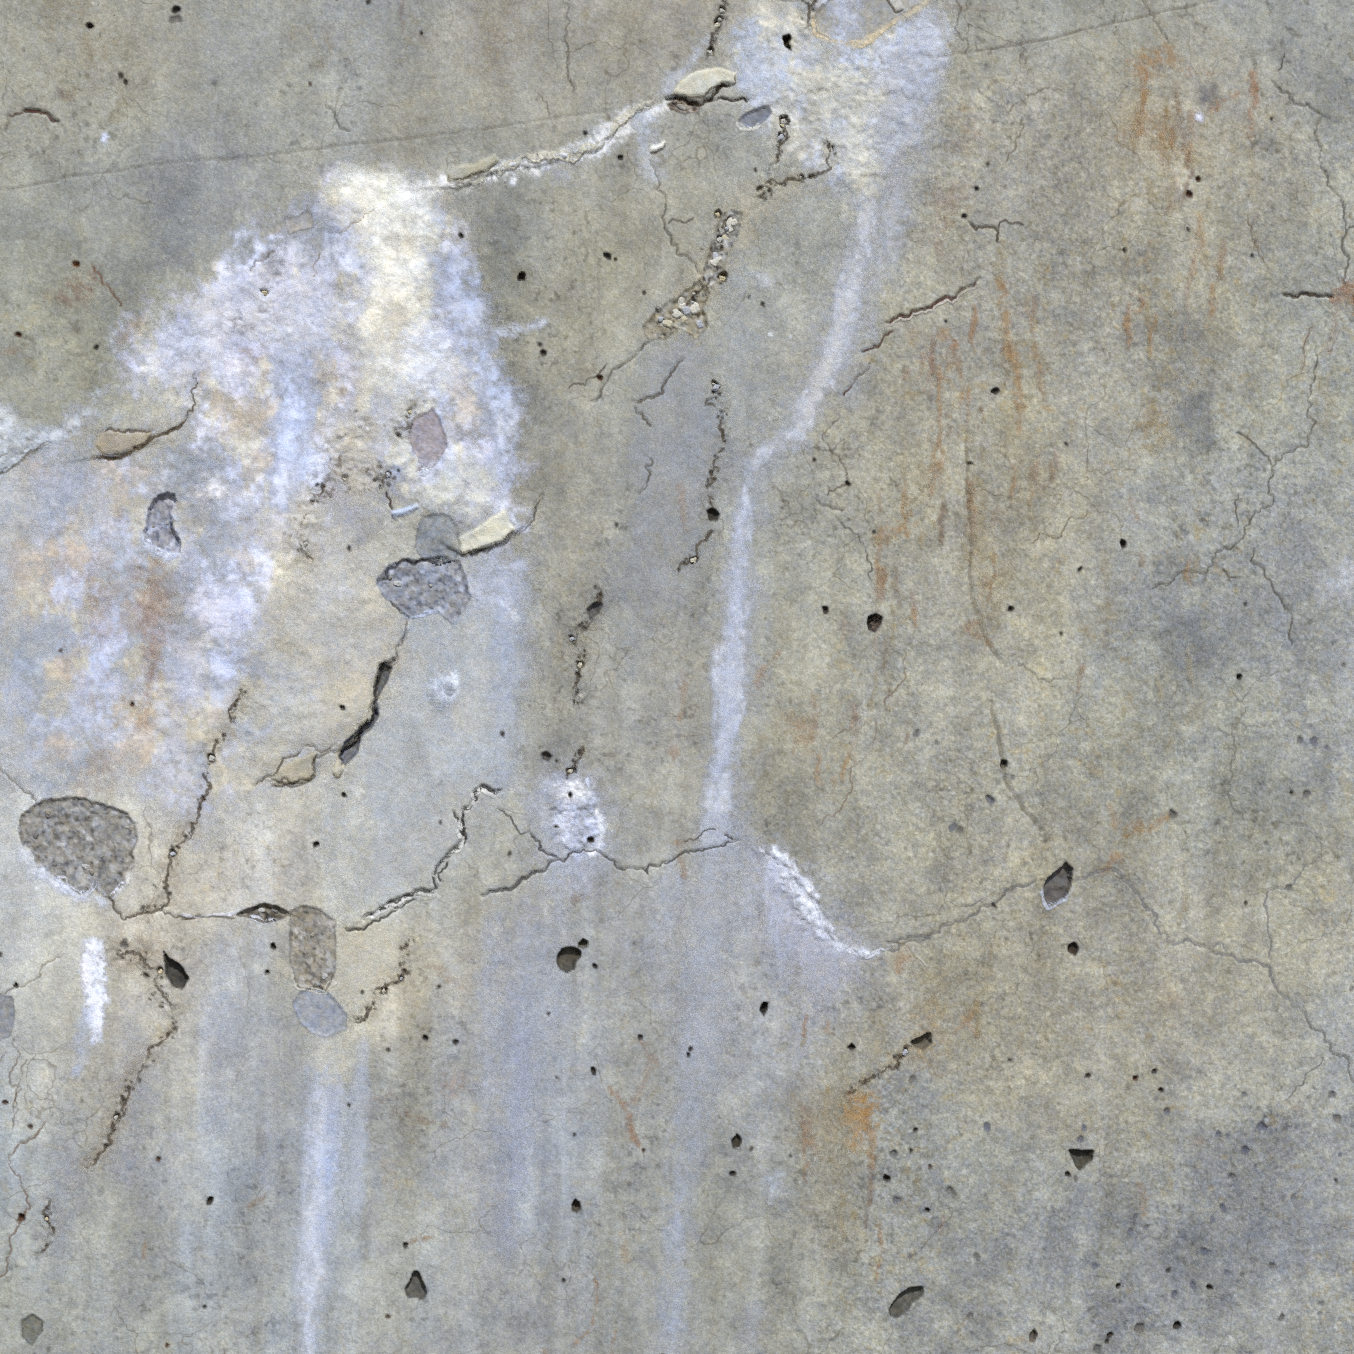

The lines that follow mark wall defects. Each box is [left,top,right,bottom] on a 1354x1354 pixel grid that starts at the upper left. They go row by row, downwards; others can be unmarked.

crack [452,0,747,184]
crack [754,116,834,200]
crack [569,186,733,426]
spalling [376,503,515,624]
leakage [0,0,956,1004]
crack [678,380,726,572]
crack [257,661,389,784]
spalling [0,983,18,1039]
spalling [19,795,138,899]
crack [86,690,246,1168]
spalling [236,903,347,1037]
crack [346,785,1034,1023]